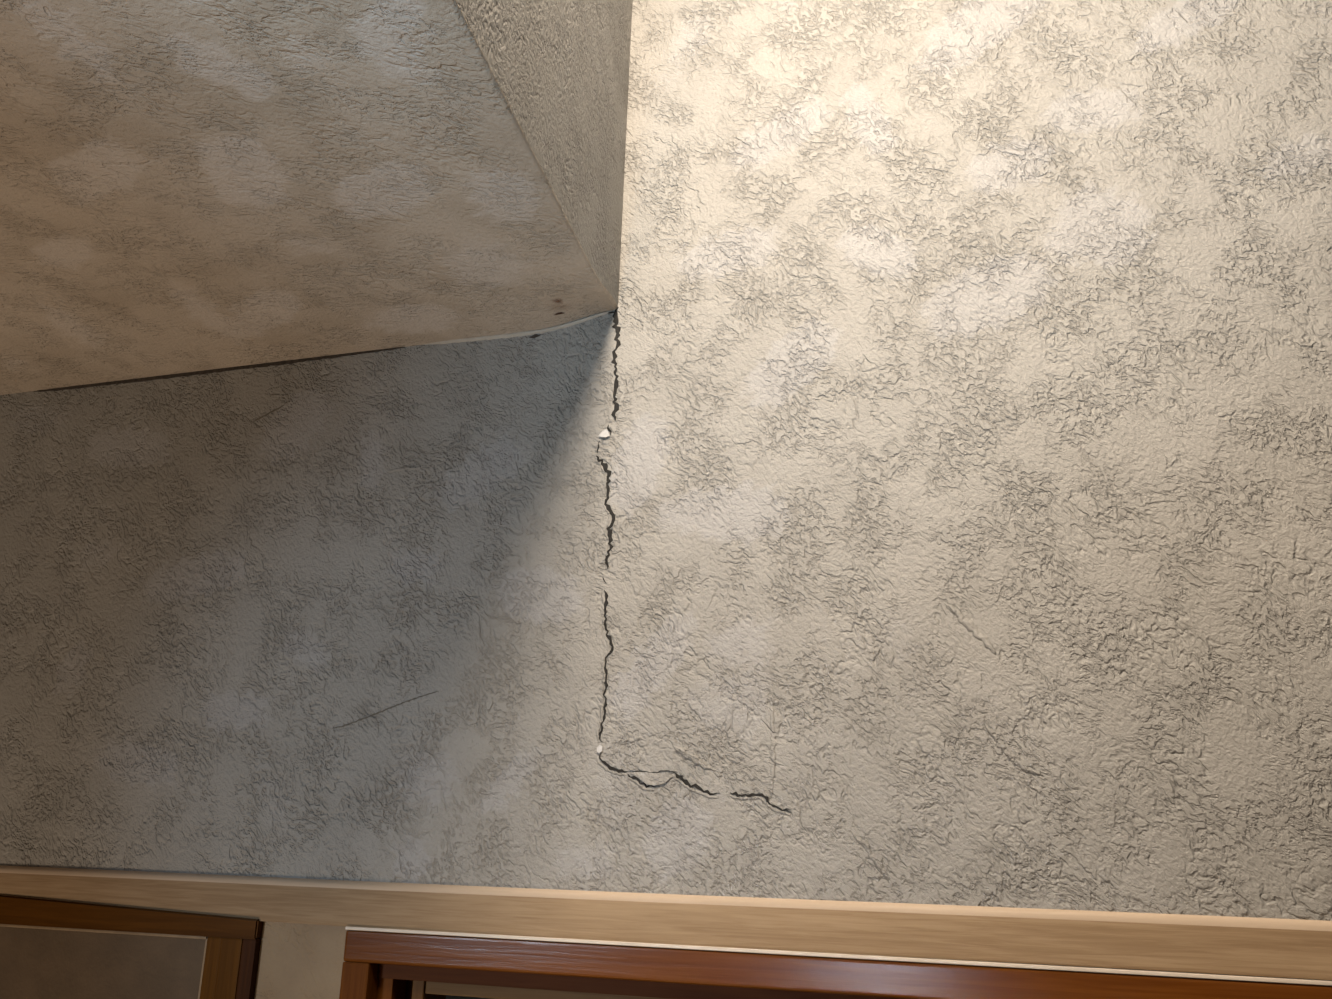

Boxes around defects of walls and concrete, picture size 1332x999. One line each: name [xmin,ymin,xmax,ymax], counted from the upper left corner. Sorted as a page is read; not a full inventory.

crack [594,307,791,816]